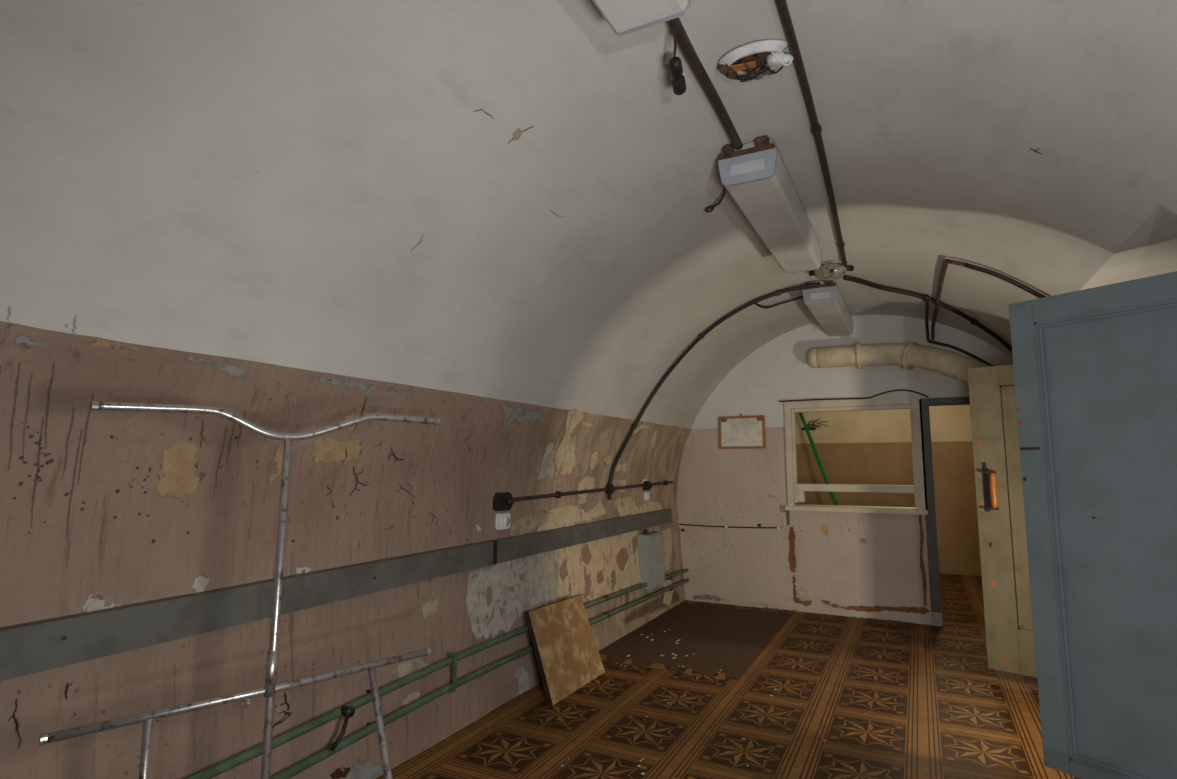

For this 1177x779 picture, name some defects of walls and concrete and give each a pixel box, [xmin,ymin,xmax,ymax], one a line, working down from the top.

water stain [13,422,54,500]
peeling [510,409,663,537]
peeling [465,531,640,640]